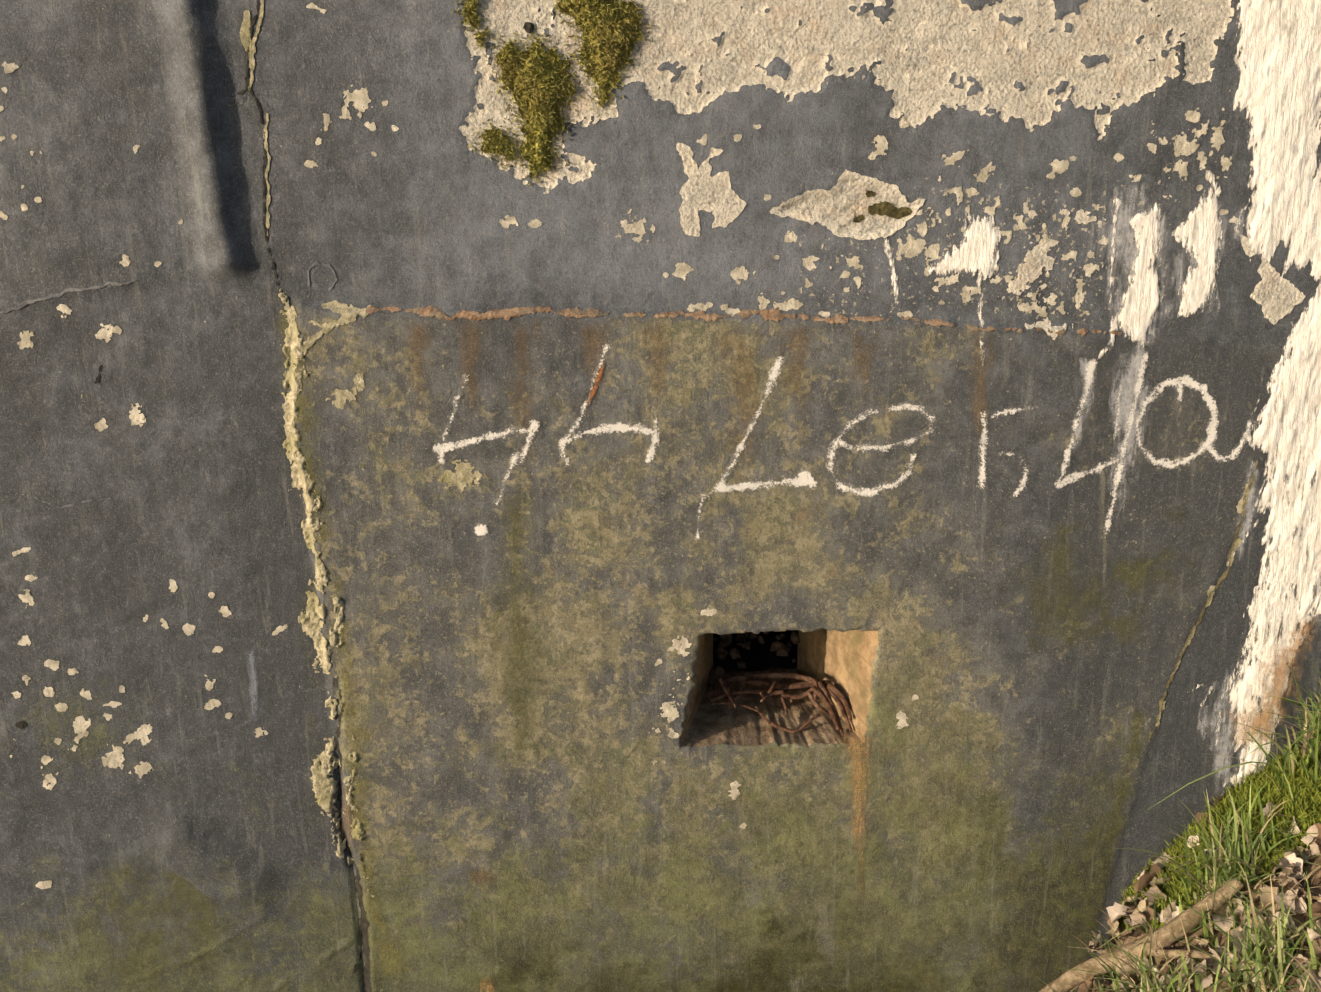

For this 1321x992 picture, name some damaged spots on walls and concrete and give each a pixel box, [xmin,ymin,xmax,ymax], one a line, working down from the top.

crack [232,0,281,293]
peeling [676,124,761,237]
peeling [458,0,1234,194]
spalling [730,149,1109,340]
peeling [1147,108,1306,325]
peeling [95,323,122,343]
rust [366,305,1123,336]
peeling [129,403,146,427]
crack [1148,460,1258,742]
peeling [41,659,125,790]
peeling [102,724,154,779]
rust [848,737,868,838]